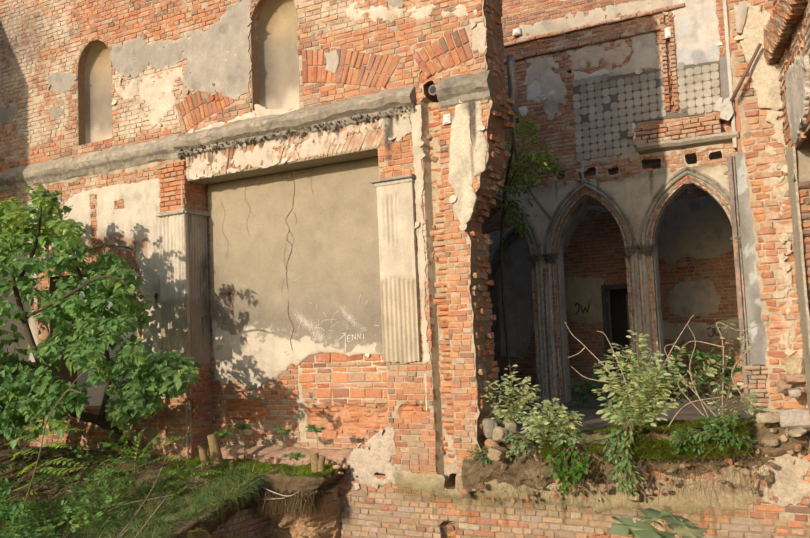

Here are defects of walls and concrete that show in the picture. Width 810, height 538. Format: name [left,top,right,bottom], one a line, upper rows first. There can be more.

flaking render [47,72,77,93]
flaking render [110,0,253,127]
flaking render [0,201,76,370]
flaking render [21,158,183,369]
crack [281,176,313,293]
flaking render [188,0,810,514]